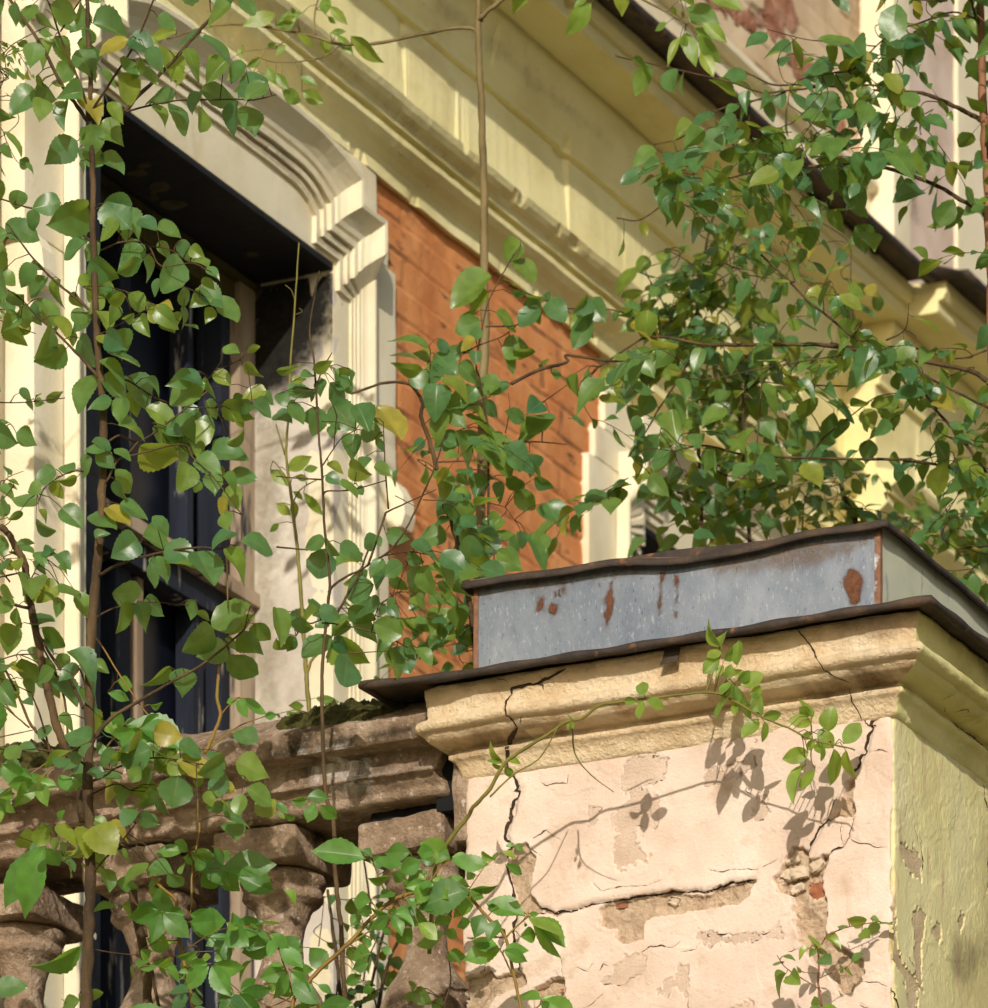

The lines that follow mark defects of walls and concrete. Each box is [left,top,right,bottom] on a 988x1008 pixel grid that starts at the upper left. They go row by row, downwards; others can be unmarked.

flaking render [709,0,800,41]
rust [537,588,564,614]
rust [604,582,614,624]
rust [843,569,863,604]
crack [797,630,910,772]
crack [467,669,776,973]
peeling [588,753,669,870]
flaking render [836,782,856,818]
crack [809,799,887,854]
flaking render [601,881,757,986]
flaking render [776,849,865,994]
peeling [893,908,941,1008]